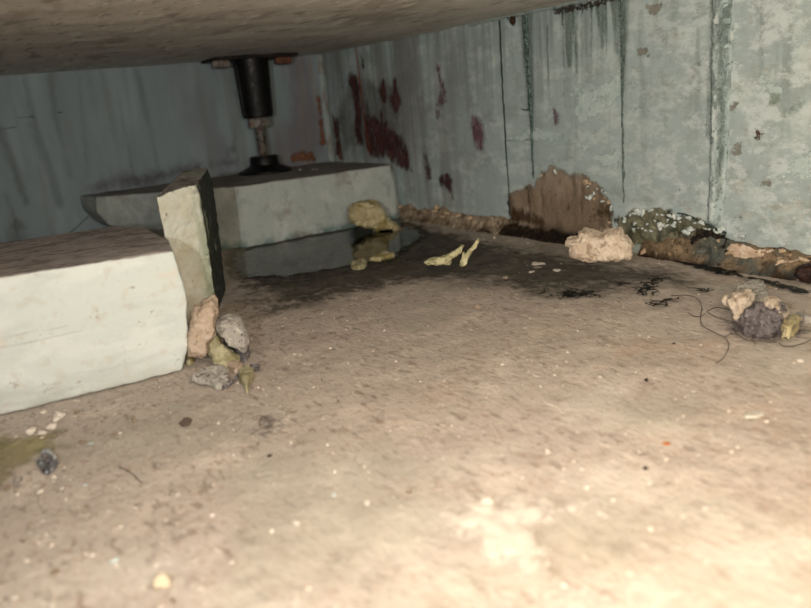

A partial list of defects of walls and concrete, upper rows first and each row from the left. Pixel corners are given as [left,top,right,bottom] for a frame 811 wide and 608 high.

corrosion [317,96,344,161]
leakage [521,14,534,178]
leakage [553,0,626,203]
leakage [244,220,714,313]
spalling [398,165,613,267]
leakage [614,208,728,249]
spalling [637,236,811,283]
leakage [0,431,60,481]